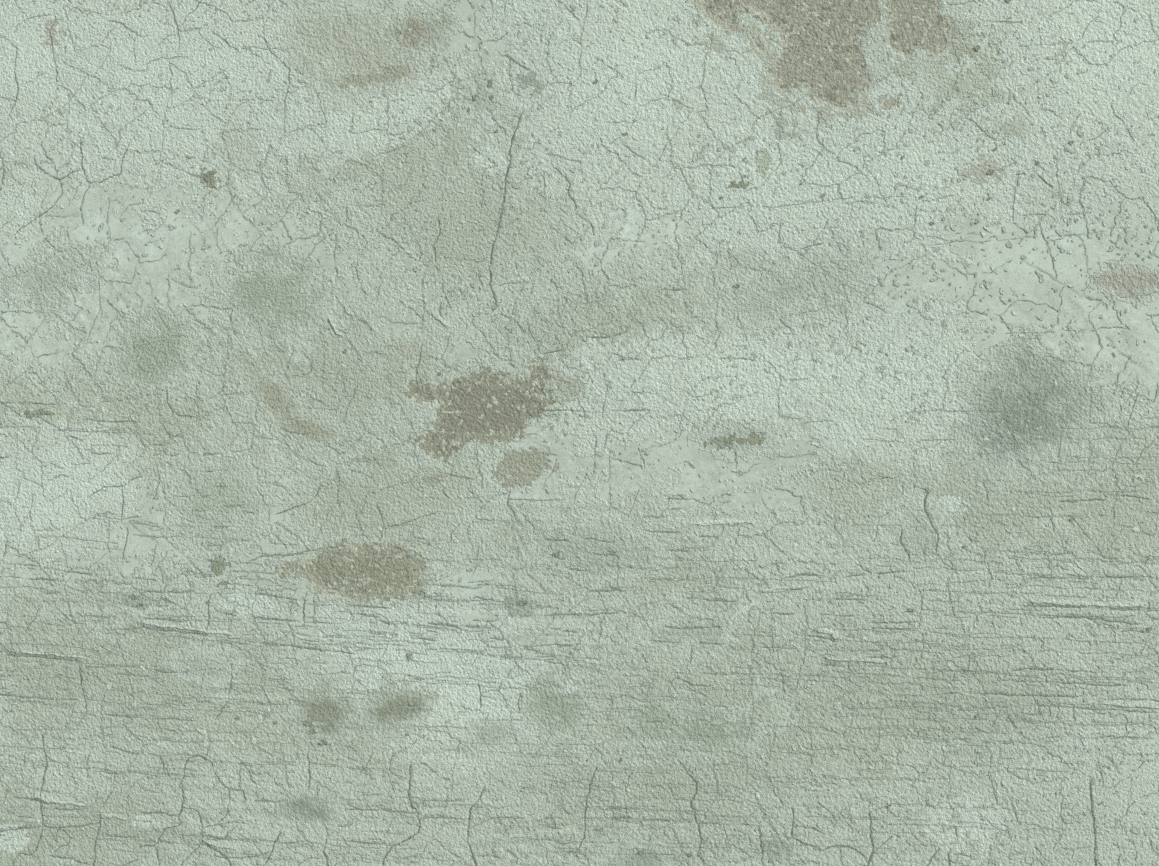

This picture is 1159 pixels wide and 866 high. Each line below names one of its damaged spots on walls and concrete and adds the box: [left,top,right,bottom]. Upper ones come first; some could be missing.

spalling [691,0,980,125]
crack [795,49,920,204]
crack [942,34,1004,140]
crack [1019,0,1159,66]
spalling [265,528,444,615]
crack [0,0,853,866]
spalling [384,328,588,487]
crack [567,391,1021,633]
crack [864,106,1159,619]
crack [413,442,1159,866]